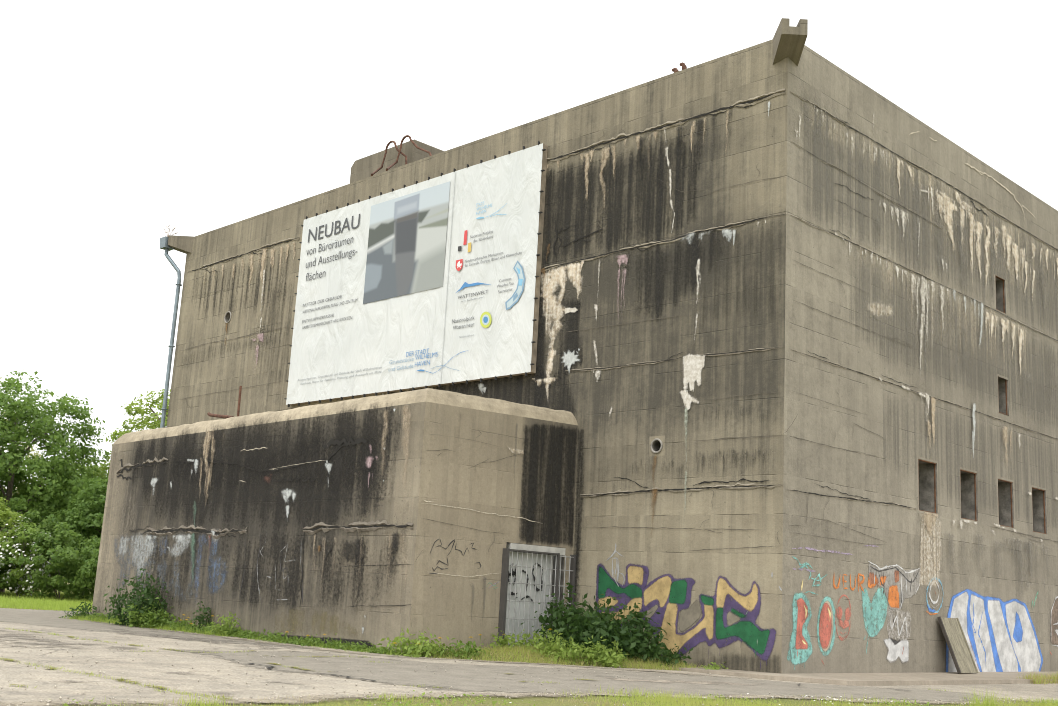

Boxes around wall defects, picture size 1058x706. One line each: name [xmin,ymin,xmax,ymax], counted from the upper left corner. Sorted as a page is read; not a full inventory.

crack [541,88,1058,342]
leakage [813,110,1058,416]
leakage [100,120,738,613]
crack [566,259,1058,440]
crack [116,450,168,480]
crack [580,477,923,551]
crack [700,391,888,456]
leakage [902,385,959,493]
leakage [972,404,1025,477]